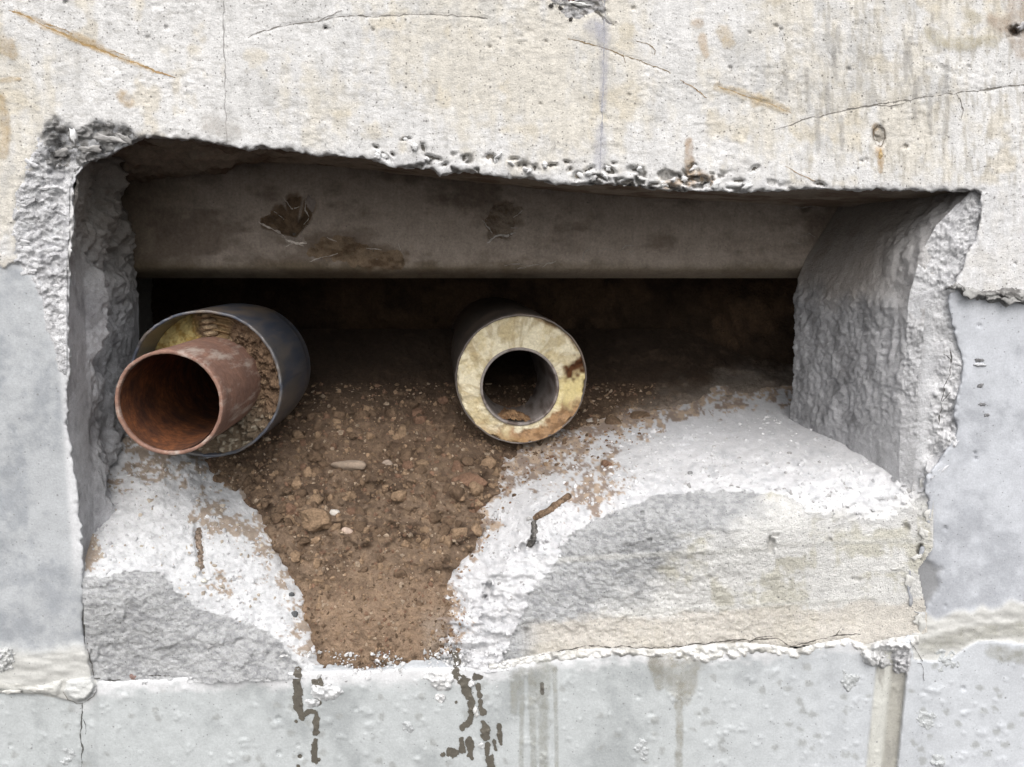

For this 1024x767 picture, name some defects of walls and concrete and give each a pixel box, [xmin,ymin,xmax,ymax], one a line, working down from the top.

crack [572,0,1024,175]
spalling [374,146,394,160]
spalling [403,137,447,166]
spalling [486,151,642,184]
spalling [650,164,720,189]
spalling [11,119,138,377]
spalling [259,194,405,270]
spalling [482,201,523,243]
rust [526,493,572,548]
crack [541,630,861,655]